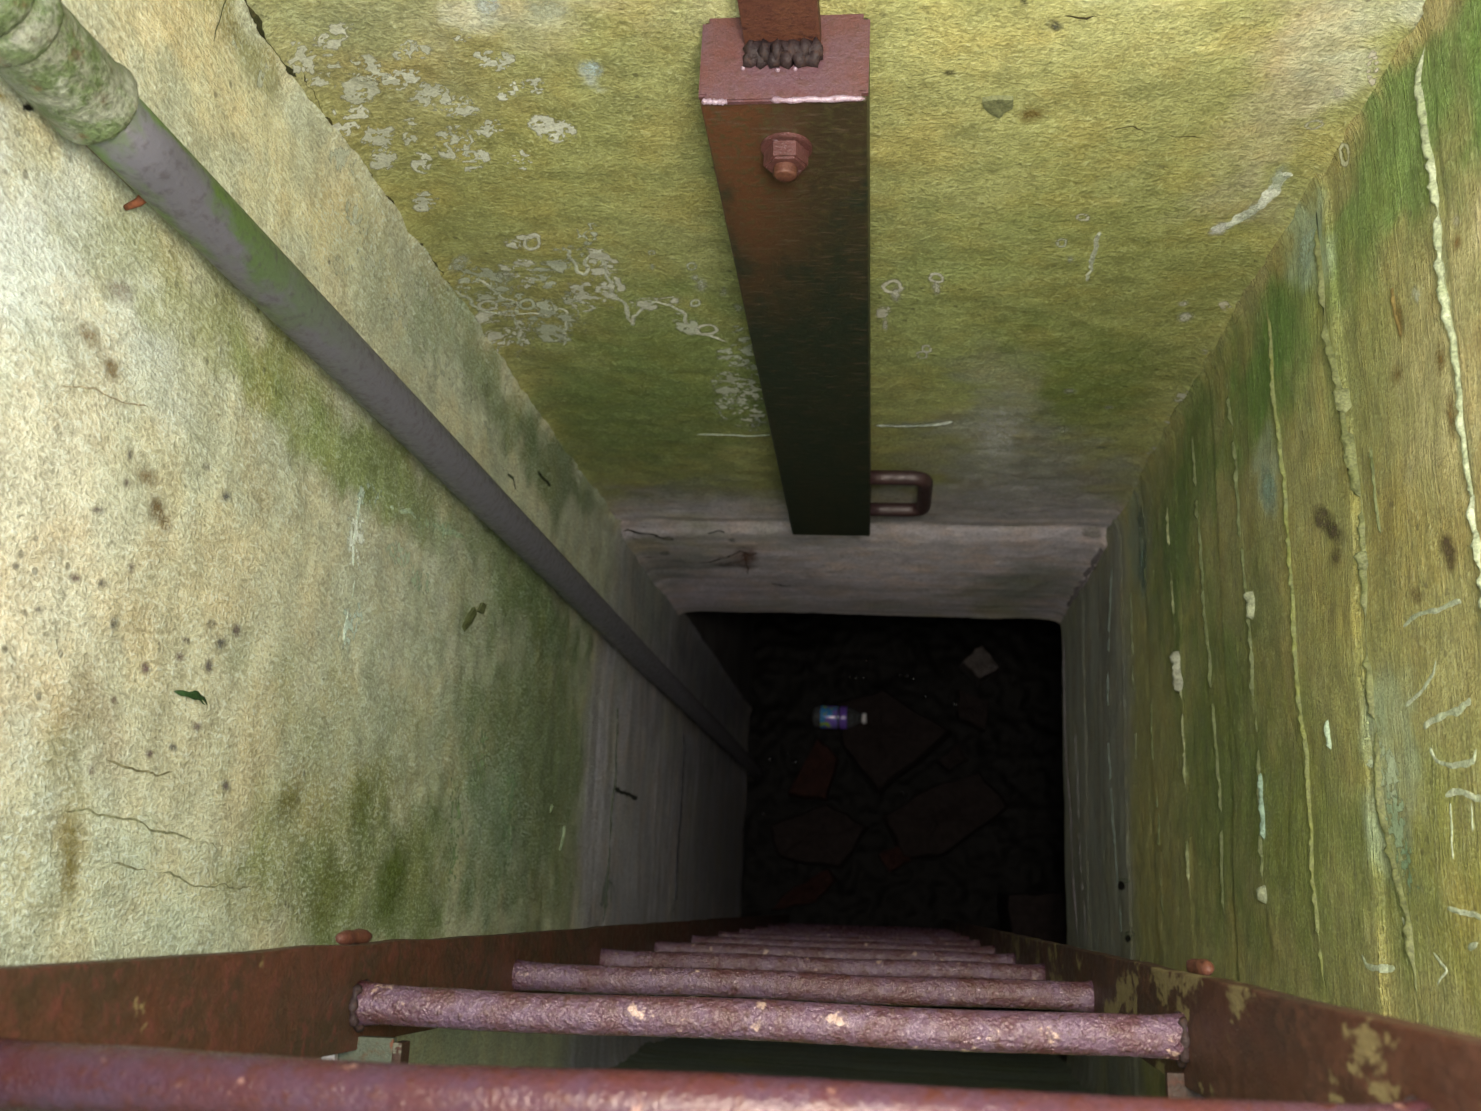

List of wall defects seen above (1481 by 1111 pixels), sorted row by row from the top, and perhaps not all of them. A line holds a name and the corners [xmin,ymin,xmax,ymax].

crack [1066,13,1120,21]
peeling [288,22,543,212]
peeling [527,115,577,143]
crack [1115,126,1202,138]
peeling [448,223,766,427]
leakage [1414,48,1481,625]
crack [108,760,171,777]
crack [63,808,251,890]